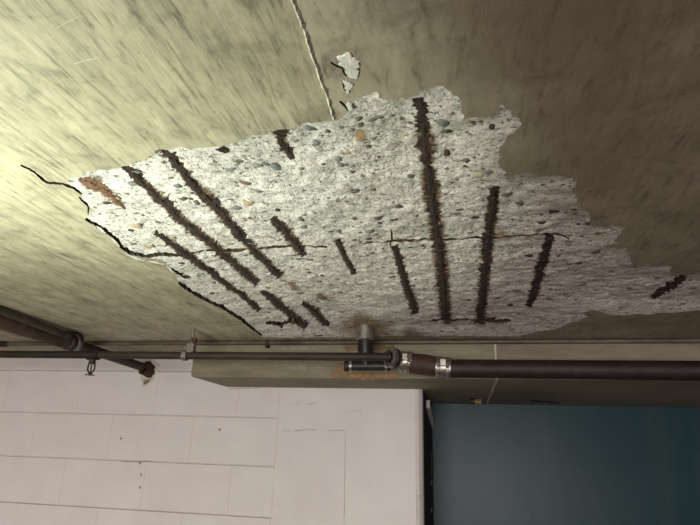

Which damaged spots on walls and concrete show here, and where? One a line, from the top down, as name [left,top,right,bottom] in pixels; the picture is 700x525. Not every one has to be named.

rust [272,129,295,160]
rust [78,177,126,209]
crack [20,165,327,336]
rust [121,149,330,332]
rust [333,238,356,275]
spalling [67,52,700,338]
rust [390,244,420,316]
rust [412,98,454,324]
crack [350,229,569,247]
rust [473,186,504,325]
rust [525,233,556,307]
rust [651,274,686,299]